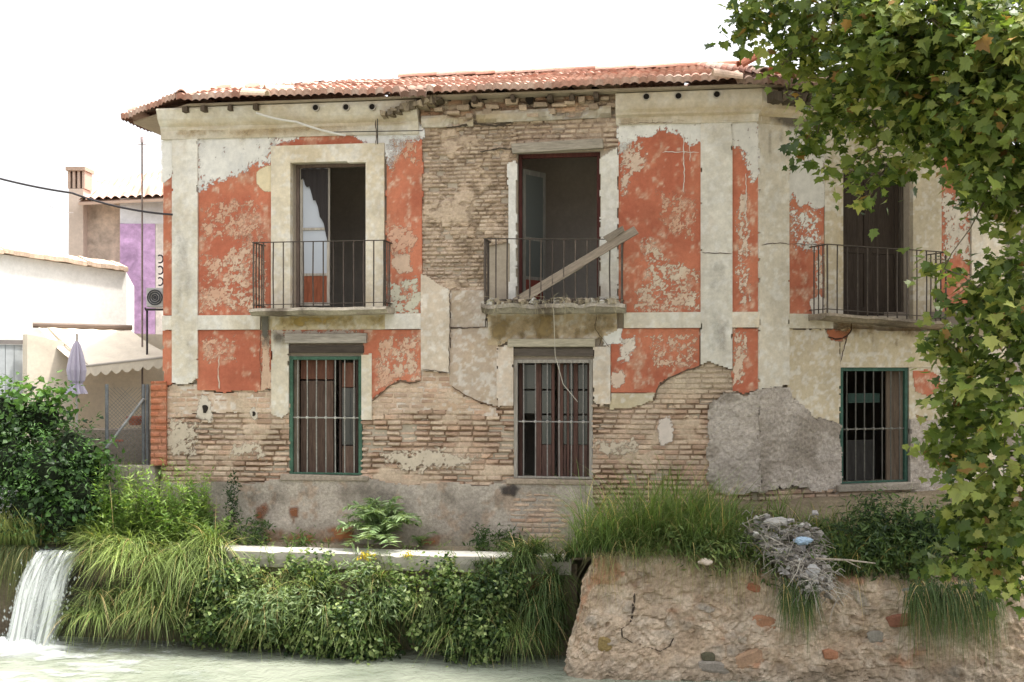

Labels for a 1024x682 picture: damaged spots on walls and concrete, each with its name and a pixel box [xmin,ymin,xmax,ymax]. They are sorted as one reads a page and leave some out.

peeling [198,196,269,314]
peeling [197,137,299,193]
spalling [354,84,701,314]
peeling [731,122,760,304]
peeling [788,126,825,314]
spalling [161,330,357,484]
spalling [361,335,515,486]
spalling [592,328,753,516]
spalling [826,329,850,342]
crack [621,593,674,652]